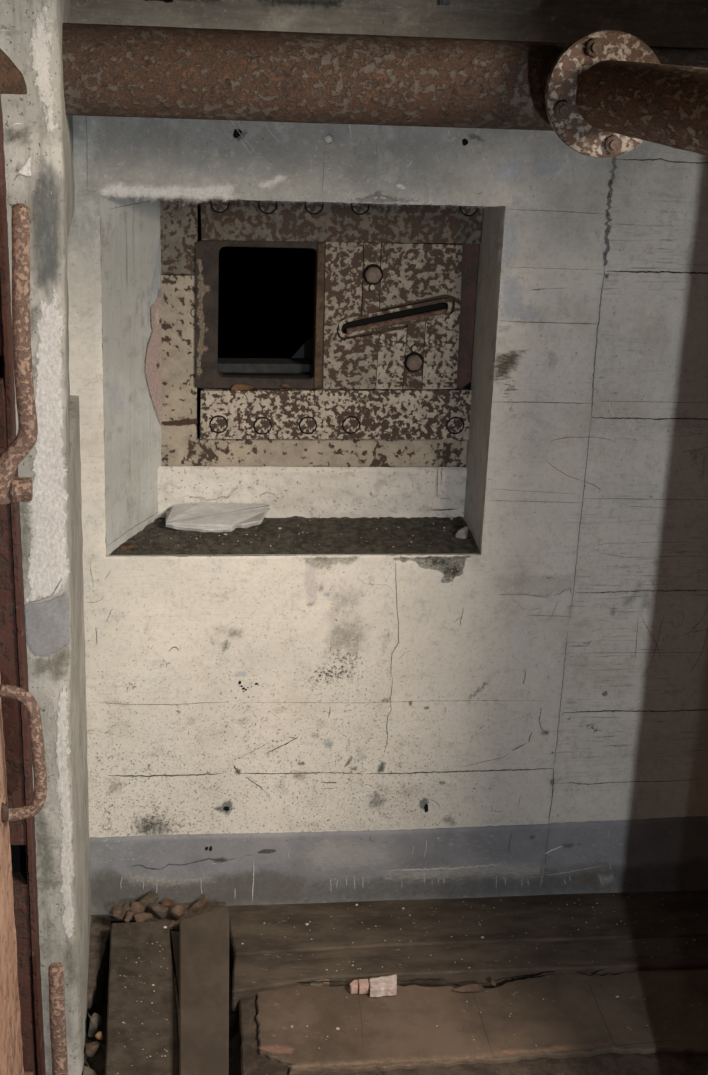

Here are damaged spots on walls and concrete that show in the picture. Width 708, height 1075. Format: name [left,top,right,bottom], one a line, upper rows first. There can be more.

spalling [392,535,470,583]
crack [364,563,412,752]
crack [132,858,236,870]